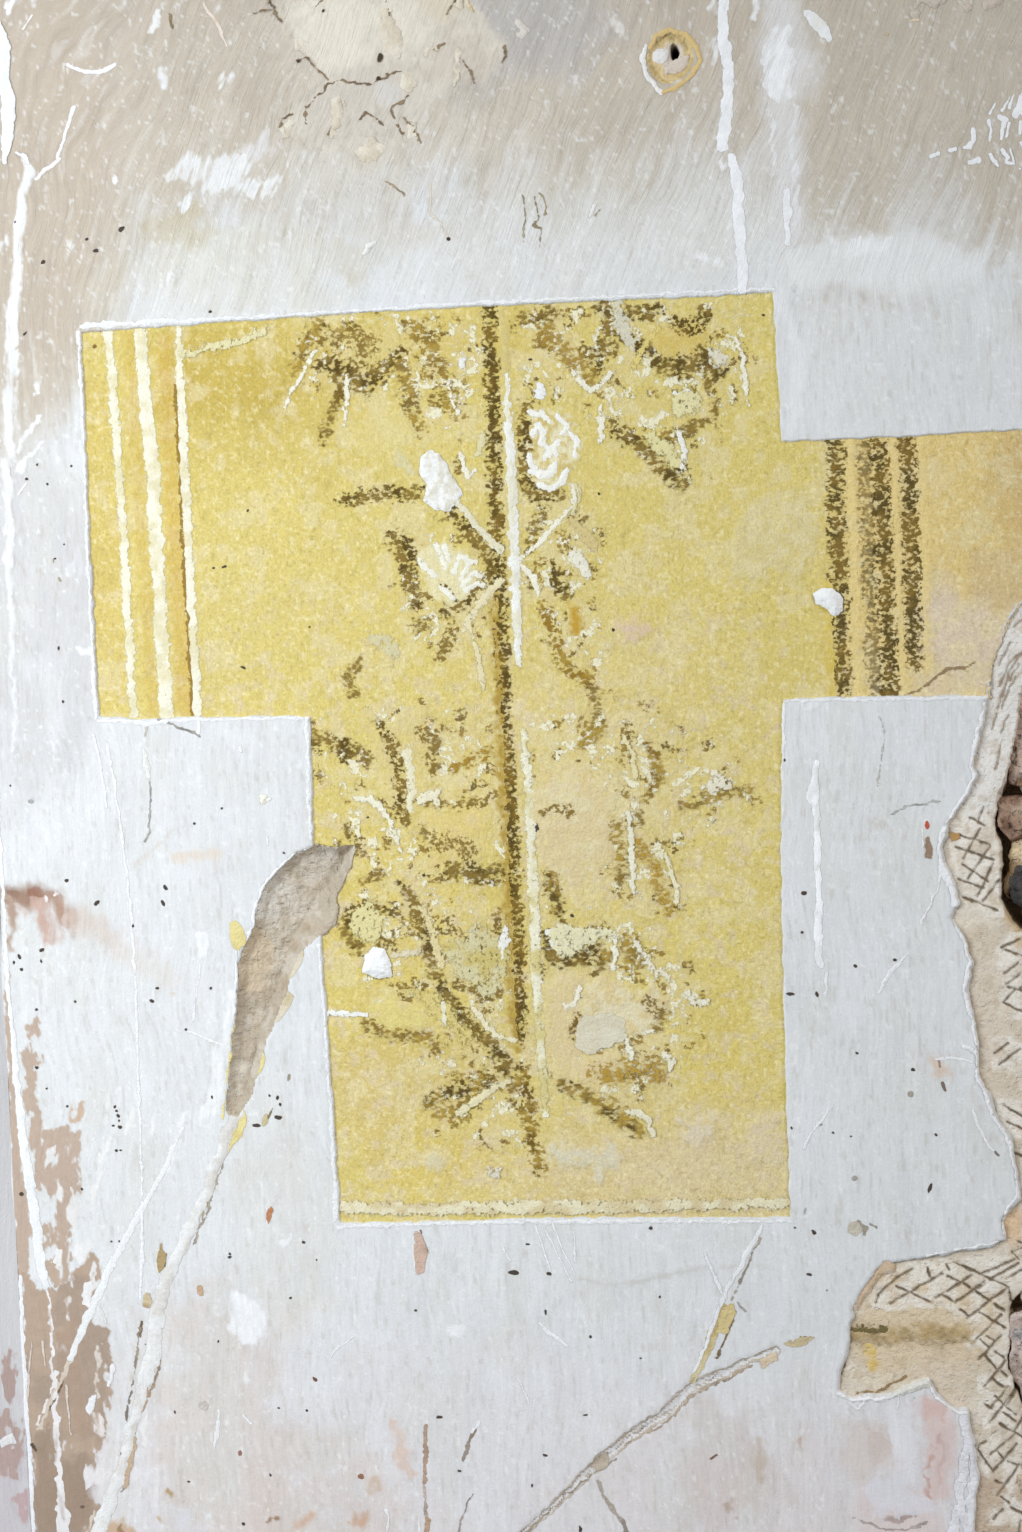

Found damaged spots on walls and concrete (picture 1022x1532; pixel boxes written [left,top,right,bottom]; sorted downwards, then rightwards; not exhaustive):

flaking render [161,0,517,216]
crack [689,0,749,295]
crack [0,21,76,754]
flaking render [211,844,357,1152]
flaking render [836,604,1022,1532]
crack [520,1225,814,1532]